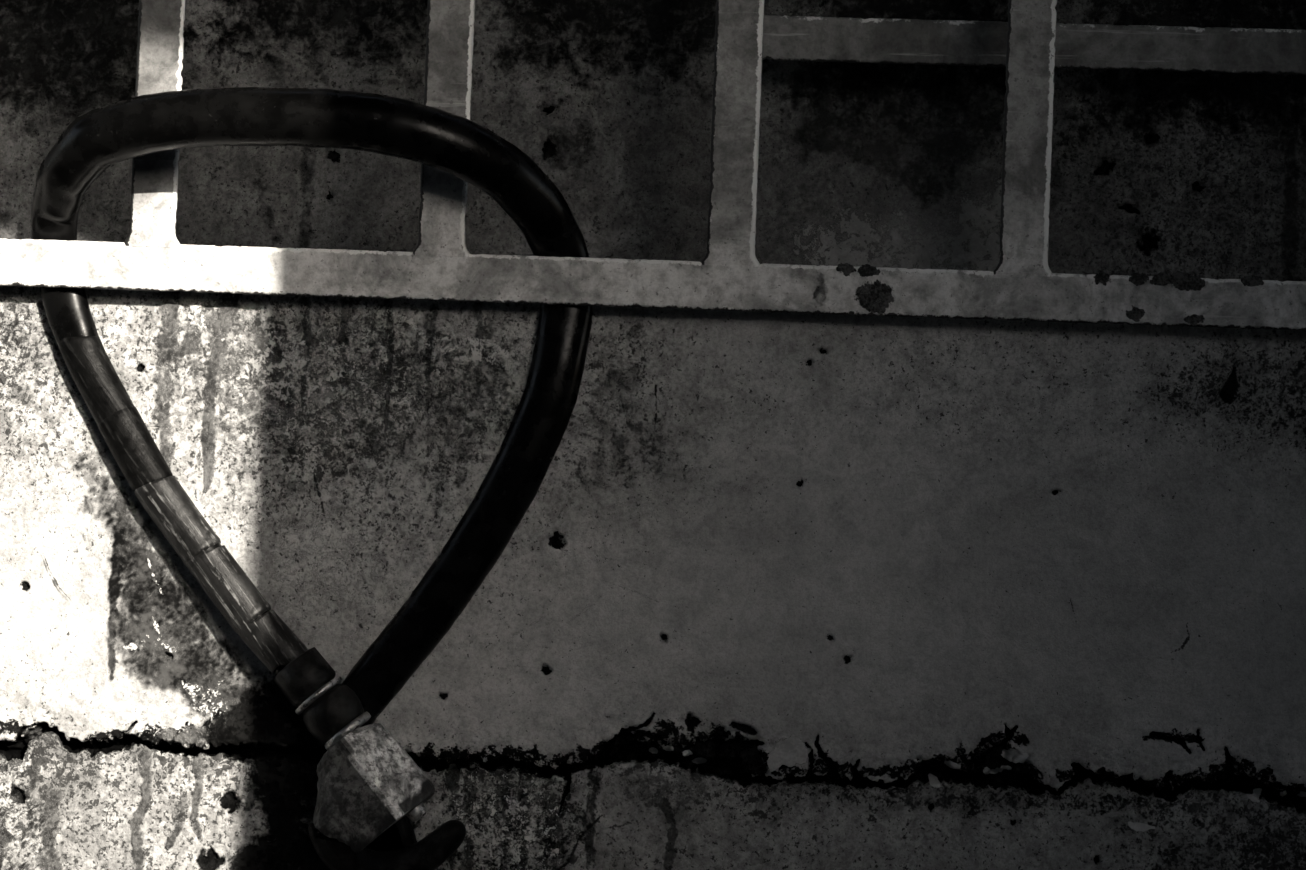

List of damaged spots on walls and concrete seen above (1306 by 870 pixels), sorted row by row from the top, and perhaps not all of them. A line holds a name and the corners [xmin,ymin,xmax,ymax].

leakage [75,451,262,719]
crack [0,718,247,762]
crack [407,712,1306,813]
crack [557,815,602,870]